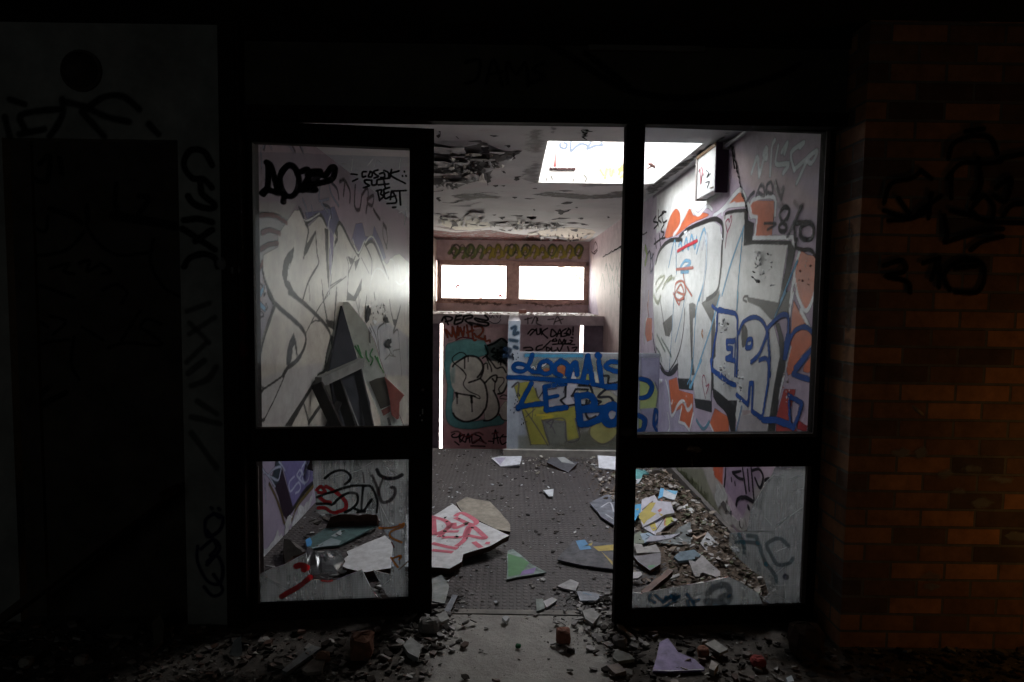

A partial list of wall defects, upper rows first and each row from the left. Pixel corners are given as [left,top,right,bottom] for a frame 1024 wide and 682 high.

peeling [434,131,522,201]
peeling [439,188,596,242]